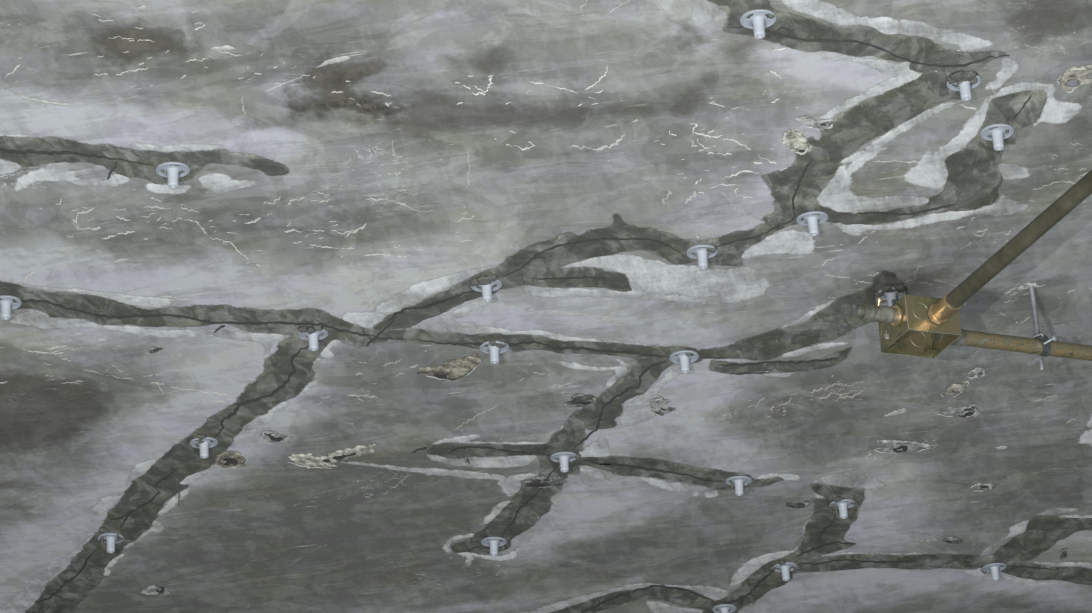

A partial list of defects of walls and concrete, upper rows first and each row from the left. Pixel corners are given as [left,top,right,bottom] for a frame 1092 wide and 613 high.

leakage [289,58,394,120]
spalling [1058,65,1092,93]
spalling [780,115,834,155]
crack [0,134,289,194]
crack [373,0,1082,331]
spalling [418,354,482,381]
spalling [215,451,246,468]
spalling [261,431,292,444]
spalling [287,444,377,469]
crack [0,270,903,613]
crack [1079,417,1092,446]
crack [525,473,1092,613]